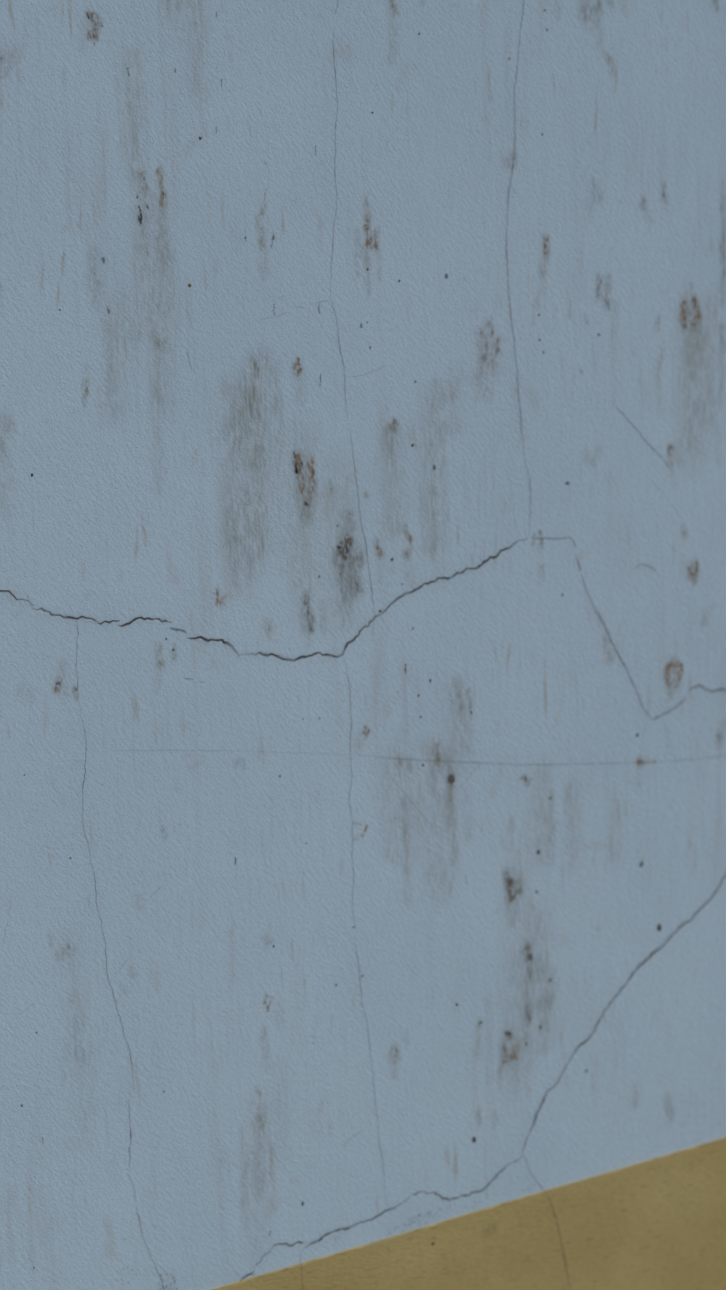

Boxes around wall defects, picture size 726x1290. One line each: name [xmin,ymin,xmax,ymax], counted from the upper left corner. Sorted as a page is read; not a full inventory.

corrosion [293,451,315,506]
crack [0,539,526,661]
crack [575,876,725,1051]
crack [526,1084,556,1139]
crack [440,1164,509,1201]
crack [277,1204,401,1247]